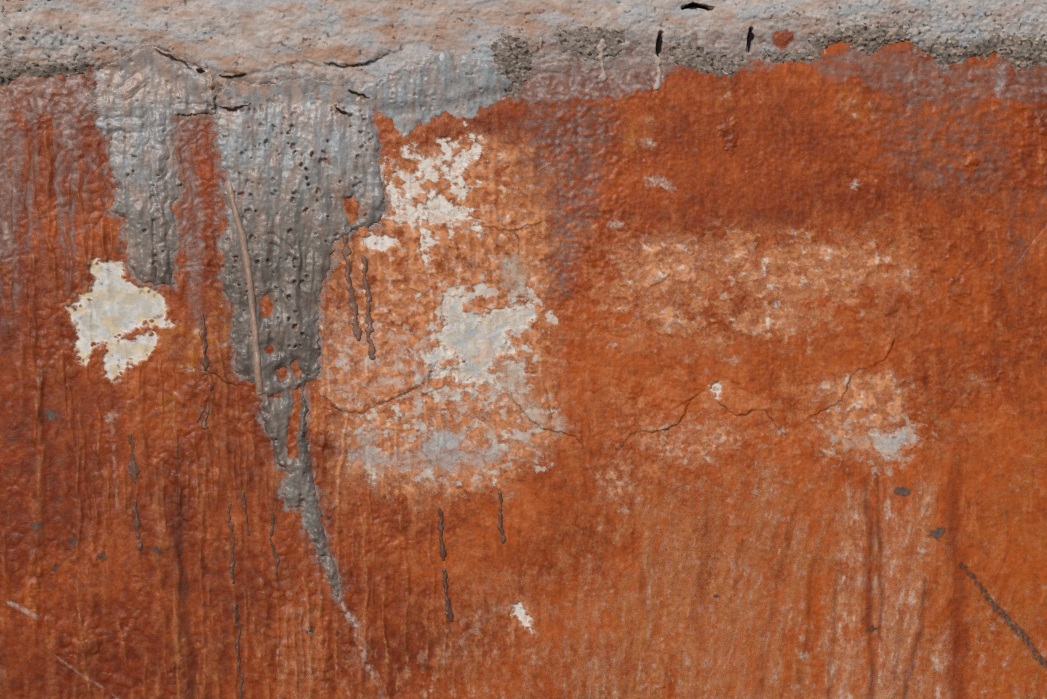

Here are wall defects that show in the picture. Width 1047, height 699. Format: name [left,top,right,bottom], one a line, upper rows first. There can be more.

peeling [64,257,229,383]
peeling [312,121,573,509]
peeling [396,630,491,698]
peeling [489,593,550,665]